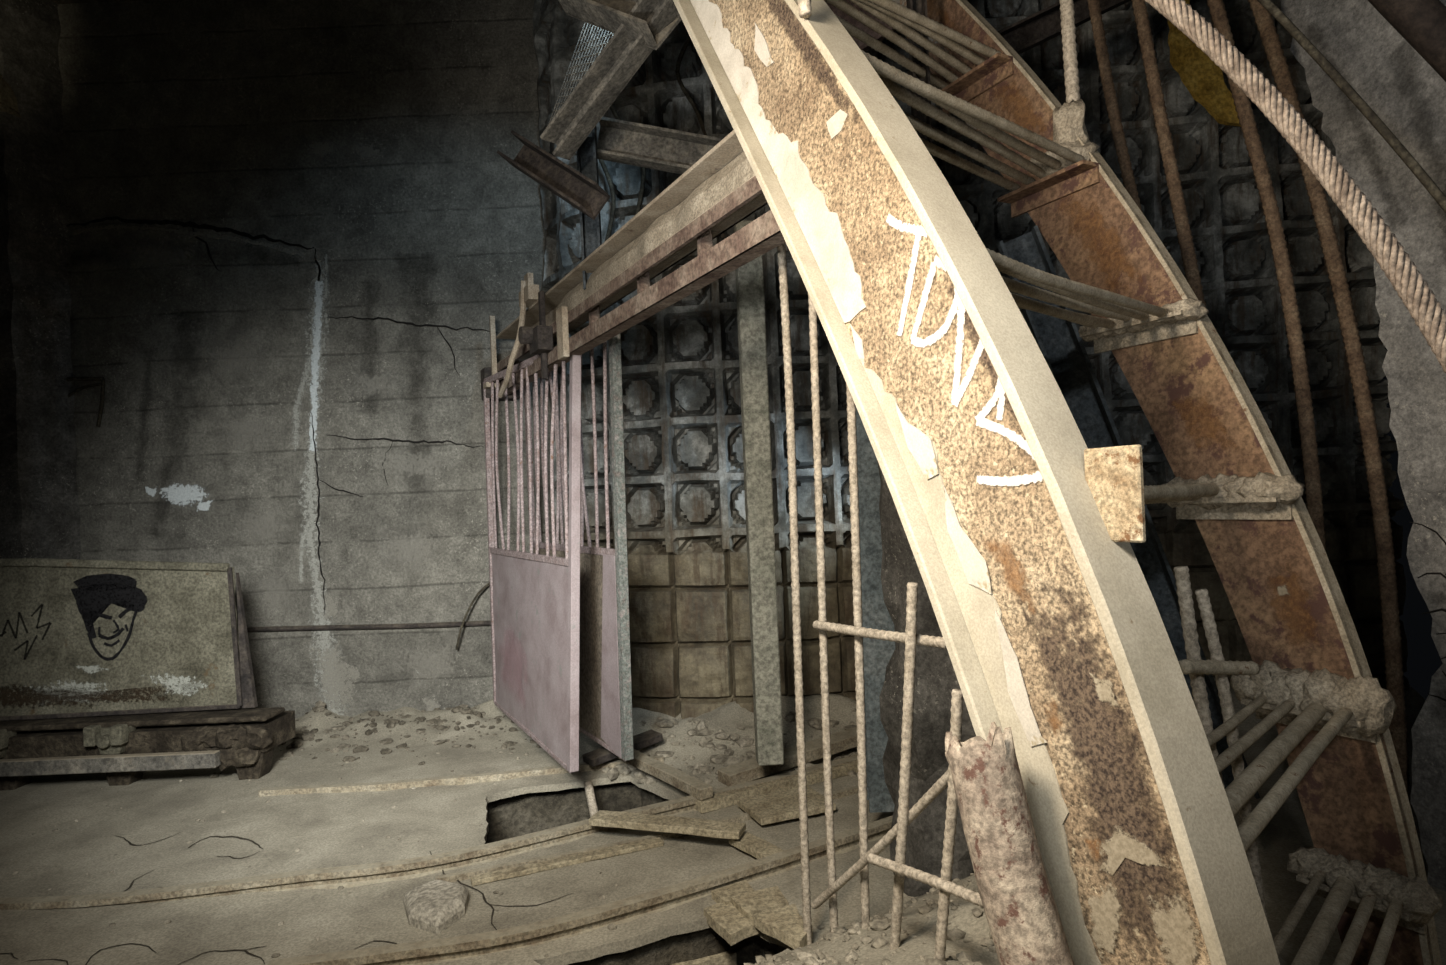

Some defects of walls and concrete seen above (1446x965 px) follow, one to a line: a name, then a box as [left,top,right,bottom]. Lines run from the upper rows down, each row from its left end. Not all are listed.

rust [767,0,858,120]
crack [66,216,497,375]
rust [963,309,1017,420]
damp [292,254,348,715]
peeling [690,0,1170,965]
crack [1410,522,1446,702]
spalling [486,782,669,844]
rust [988,543,1183,960]
spalling [568,927,786,965]